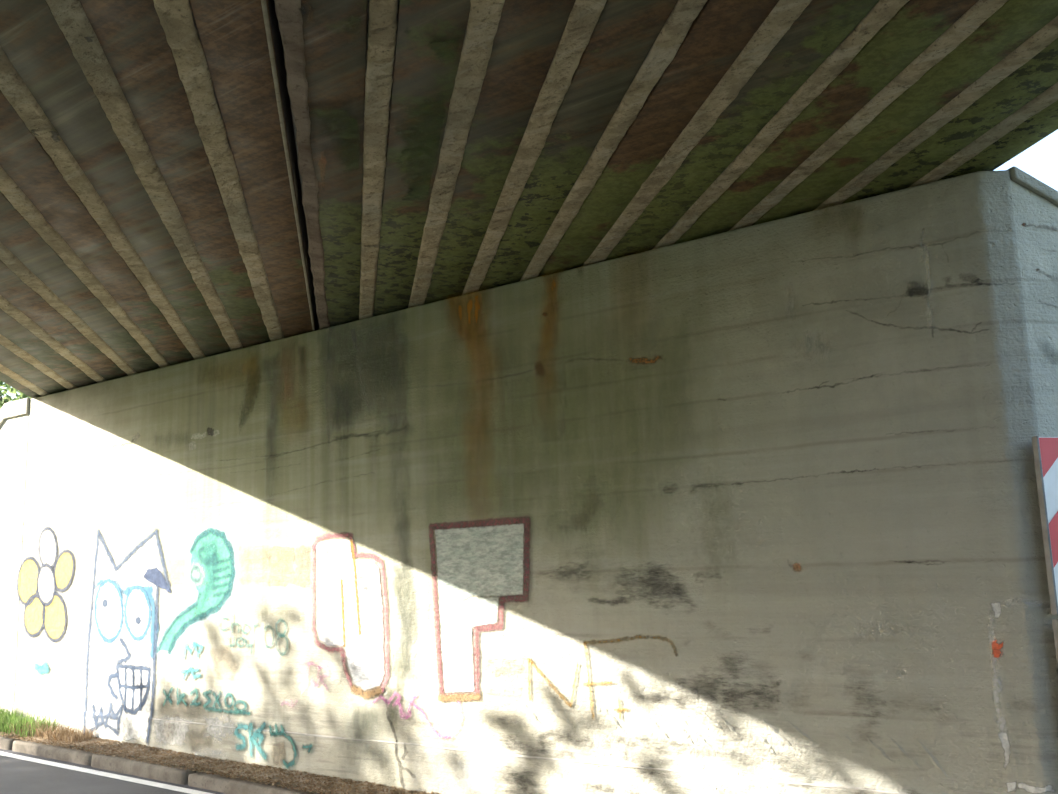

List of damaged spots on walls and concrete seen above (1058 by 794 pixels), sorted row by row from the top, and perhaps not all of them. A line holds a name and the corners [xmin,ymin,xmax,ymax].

damp [395,566,414,670]
damp [691,683,775,702]
crack [386,702,412,782]